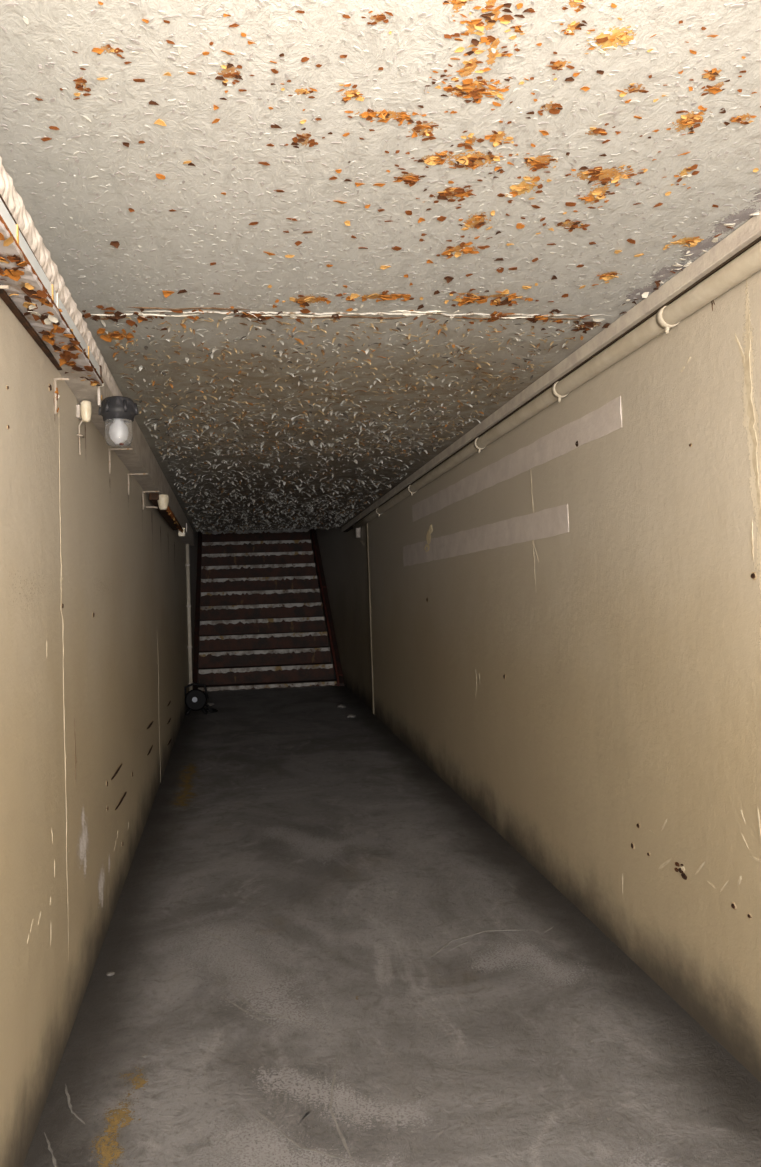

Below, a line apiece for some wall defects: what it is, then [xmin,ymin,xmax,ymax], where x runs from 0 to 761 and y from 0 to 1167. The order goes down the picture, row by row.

rust [0,233,100,386]
crack [59,437,77,892]
peeling [0,0,761,532]
crack [735,279,761,655]